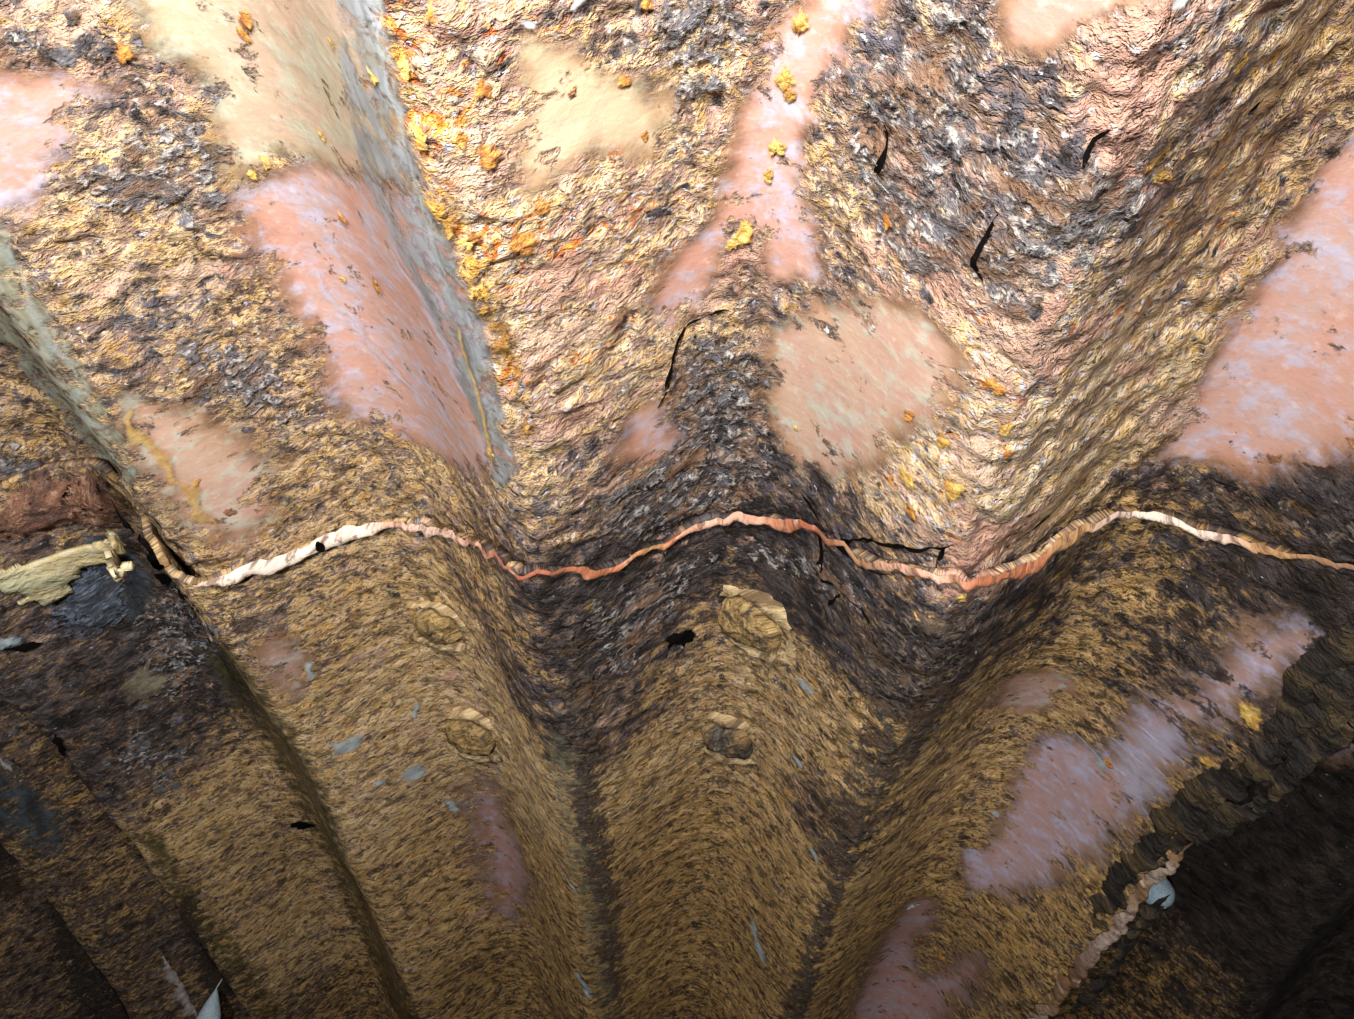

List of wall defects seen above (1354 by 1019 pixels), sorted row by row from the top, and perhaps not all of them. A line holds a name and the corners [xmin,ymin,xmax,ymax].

rust [237,10,251,31]
rust [424,1,436,23]
rust [375,12,413,95]
rust [474,78,493,98]
rust [617,74,631,87]
rust [534,201,549,215]
damp [337,0,514,486]
rust [407,119,539,463]
crack [315,541,325,552]
crack [1005,515,1050,548]
peeling [0,528,135,607]
crack [800,492,954,645]